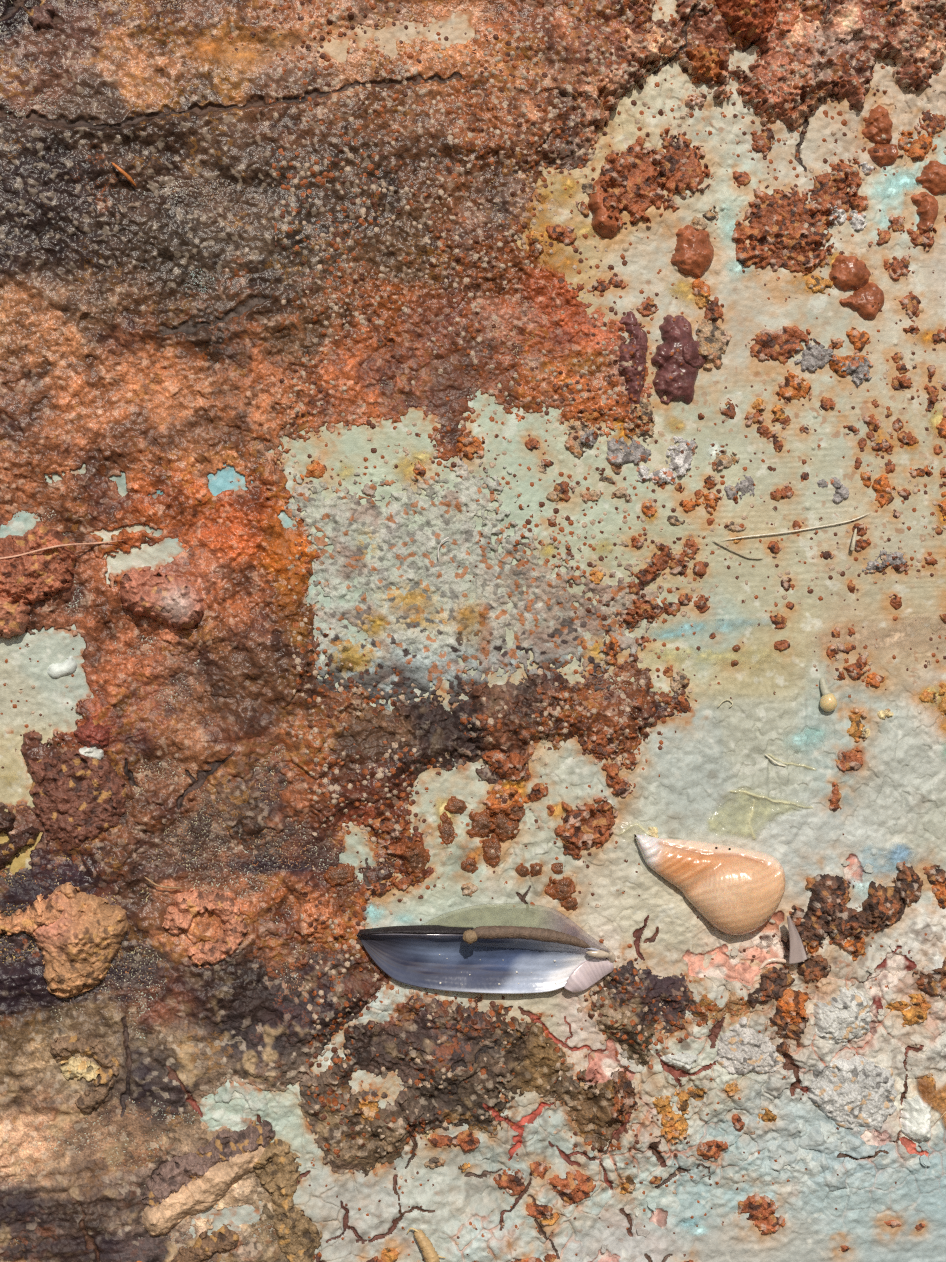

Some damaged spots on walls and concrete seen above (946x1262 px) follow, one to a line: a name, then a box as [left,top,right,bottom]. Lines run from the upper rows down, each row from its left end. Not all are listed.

crack [0,72,462,129]
rust [0,0,946,464]
rust [0,272,680,1262]
crack [451,1006,608,1073]
rust [588,960,751,1067]
crack [656,1017,725,1087]
crack [782,1053,809,1096]
crack [837,1045,924,1160]
crack [297,1124,435,1262]
crack [464,1102,711,1262]